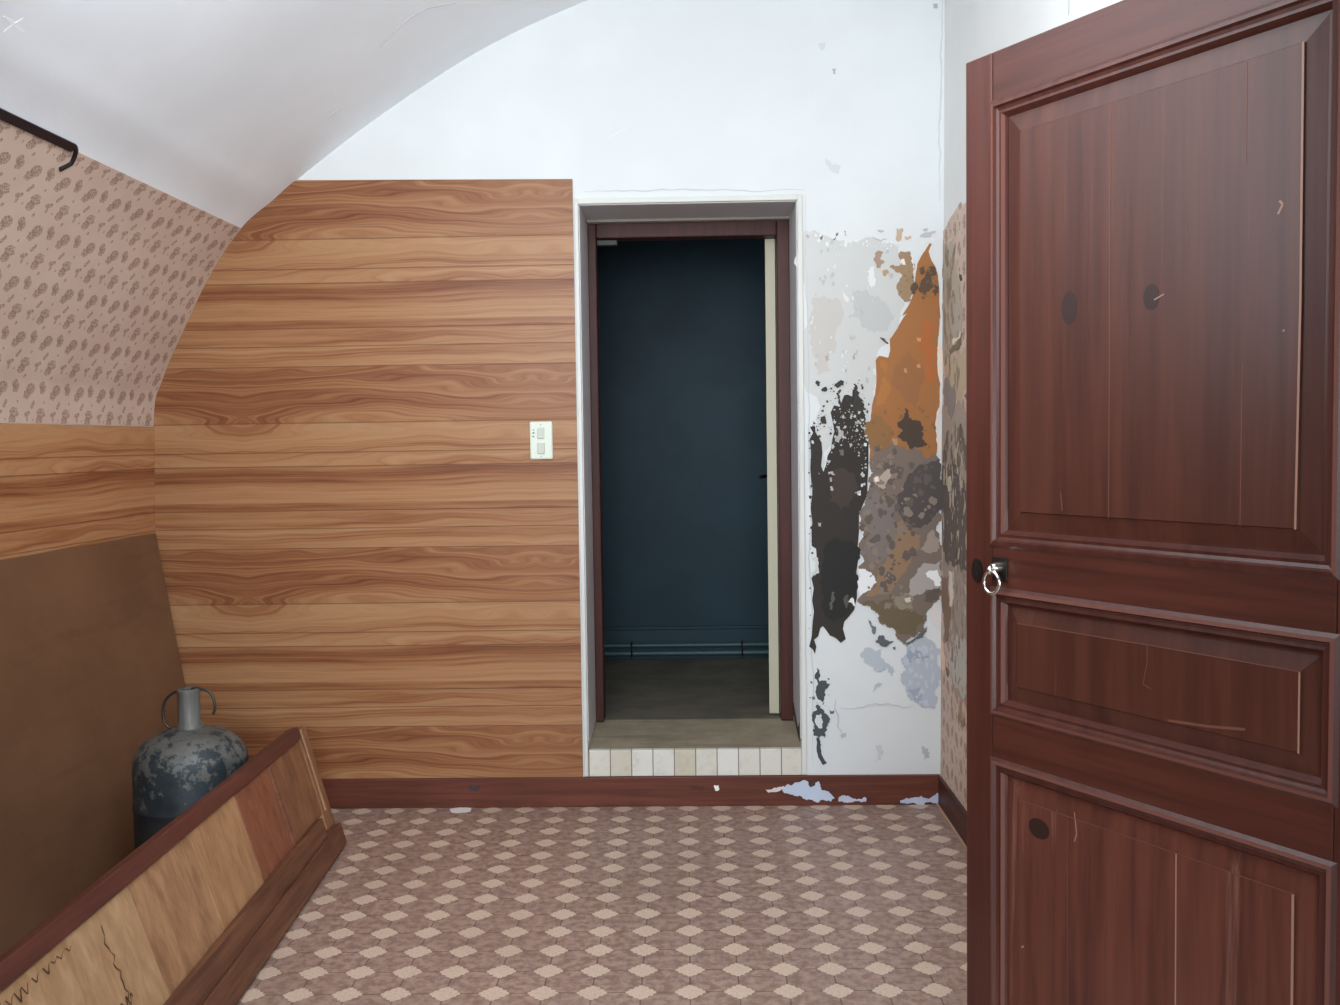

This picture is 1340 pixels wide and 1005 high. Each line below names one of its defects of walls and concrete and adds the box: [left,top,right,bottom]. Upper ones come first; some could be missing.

flaking render [794,228,943,496]
leakage [808,240,967,765]
flaking render [829,569,876,610]
flaking render [869,530,942,650]
flaking render [793,702,823,742]
peeling [766,780,866,803]
peeling [900,793,938,805]